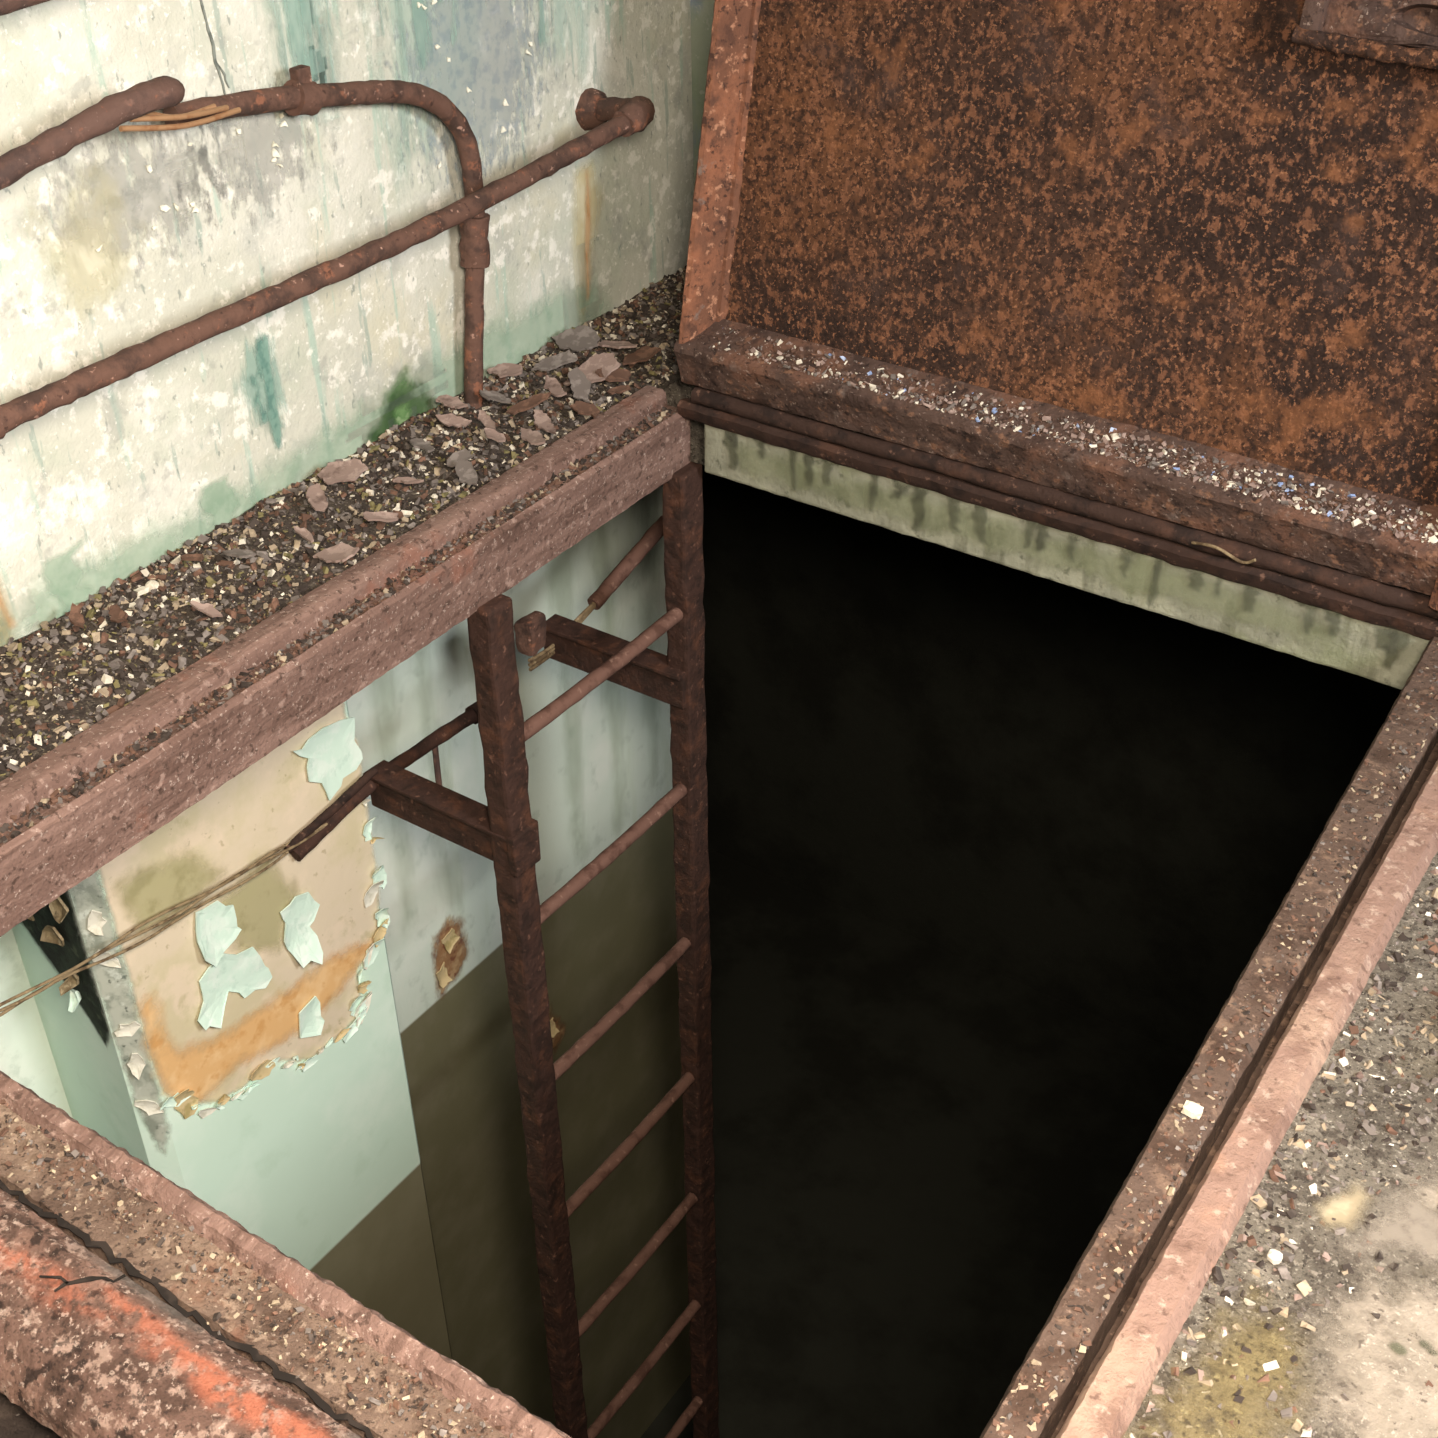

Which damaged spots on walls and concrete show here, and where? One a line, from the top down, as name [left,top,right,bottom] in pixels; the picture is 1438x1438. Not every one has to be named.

peeling [21,703,390,1152]
peeling [433,919,467,995]